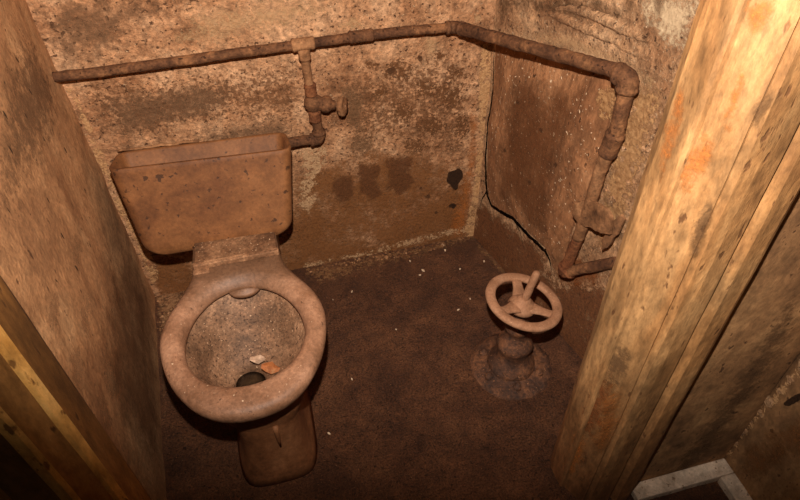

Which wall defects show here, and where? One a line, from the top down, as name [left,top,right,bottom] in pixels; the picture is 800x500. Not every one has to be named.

damp [84,67,298,139]
damp [280,38,605,359]
crack [480,56,552,271]